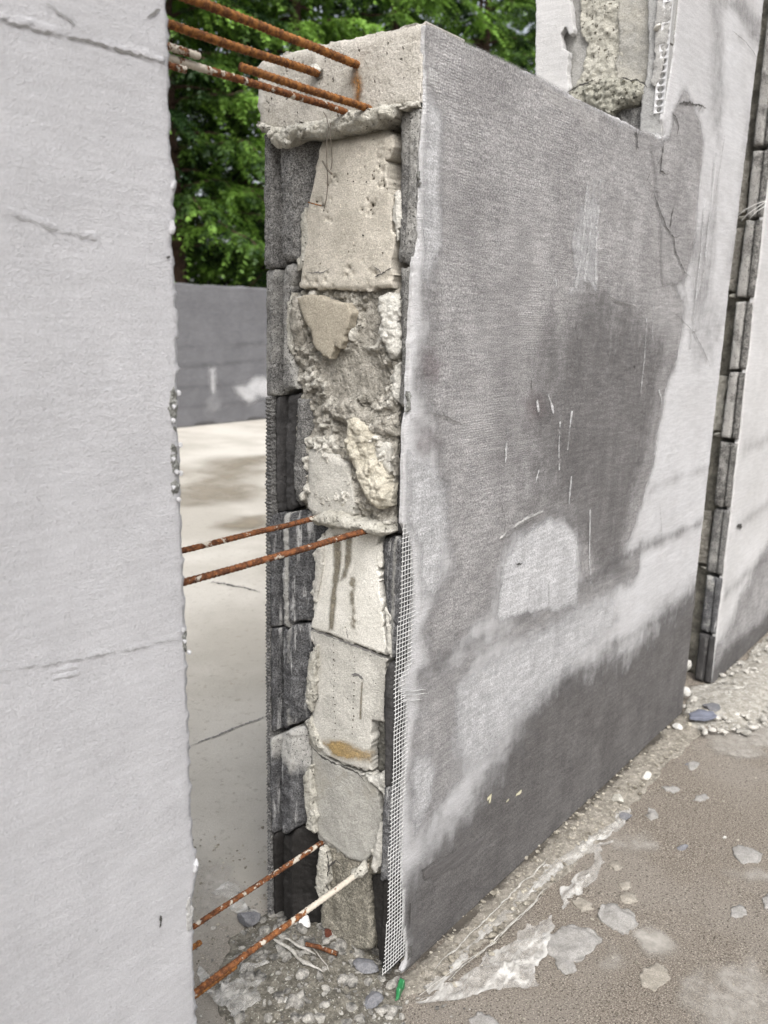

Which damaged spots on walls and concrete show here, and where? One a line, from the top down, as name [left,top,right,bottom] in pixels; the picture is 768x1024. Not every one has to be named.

crack [1,21,165,65]
crack [647,101,706,276]
peeling [297,294,359,360]
leakage [405,24,716,969]
spalling [183,529,368,586]